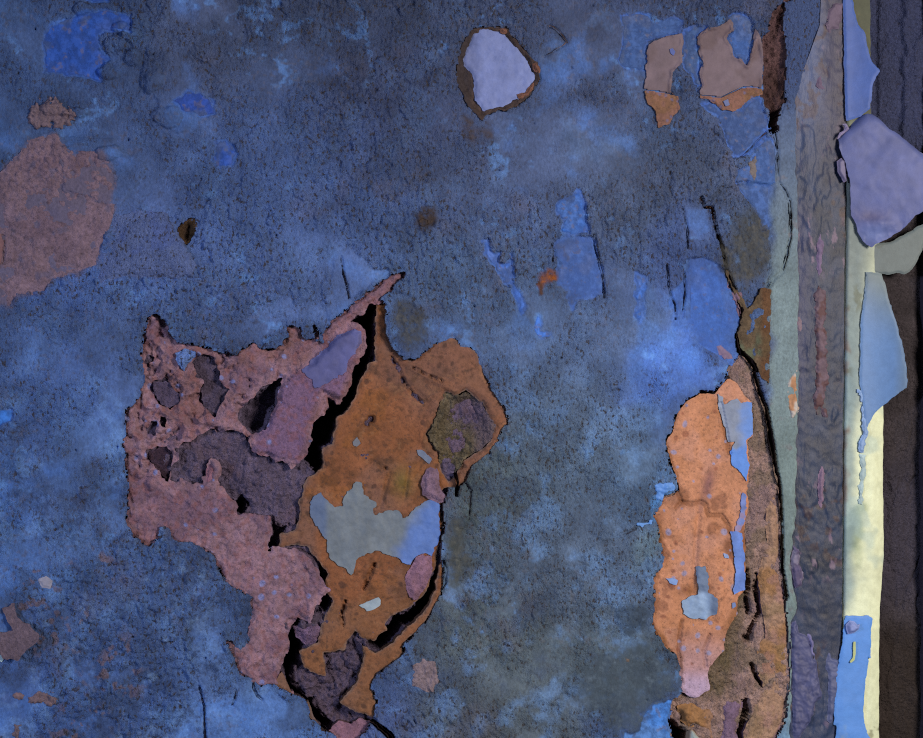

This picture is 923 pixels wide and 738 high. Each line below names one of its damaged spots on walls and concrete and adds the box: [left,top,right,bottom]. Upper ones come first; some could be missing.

peeling [43,0,131,81]
flaking render [456,27,541,120]
peeling [619,14,684,128]
peeling [697,14,764,112]
flaking render [0,133,116,308]
crack [667,264,686,312]
peeling [825,0,923,504]
crack [682,198,788,598]
flaking render [122,272,508,738]
flaking render [623,267,873,738]
flaking render [0,603,39,662]
crack [369,719,393,738]